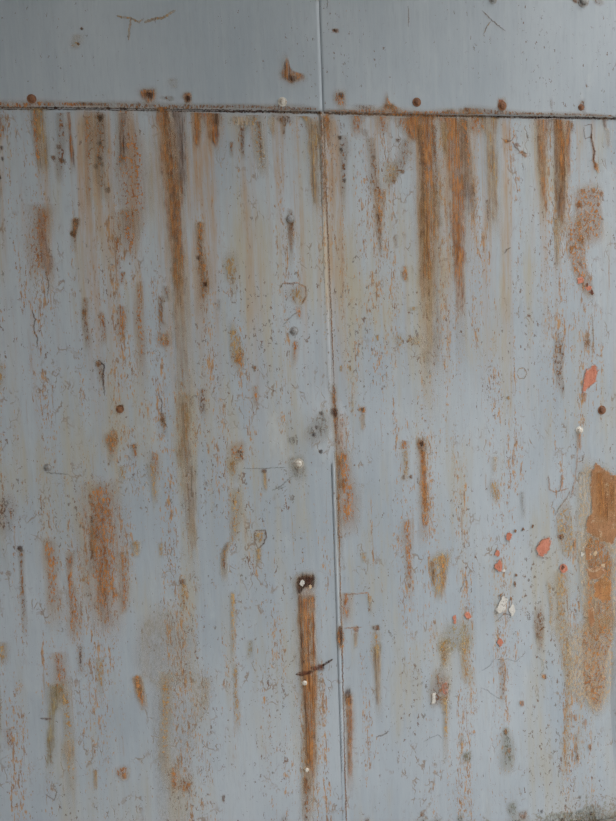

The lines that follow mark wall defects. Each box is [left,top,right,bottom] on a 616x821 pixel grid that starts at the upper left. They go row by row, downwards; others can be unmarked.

corrosion [282,60,303,83]
corrosion [0,93,615,375]
peeling [581,364,599,401]
corrosion [84,486,127,615]
corrosion [332,387,370,639]
corrosion [402,440,429,525]
peeling [536,537,552,557]
corrosion [549,465,616,760]
corrosion [299,595,317,818]
corrosion [341,642,352,821]